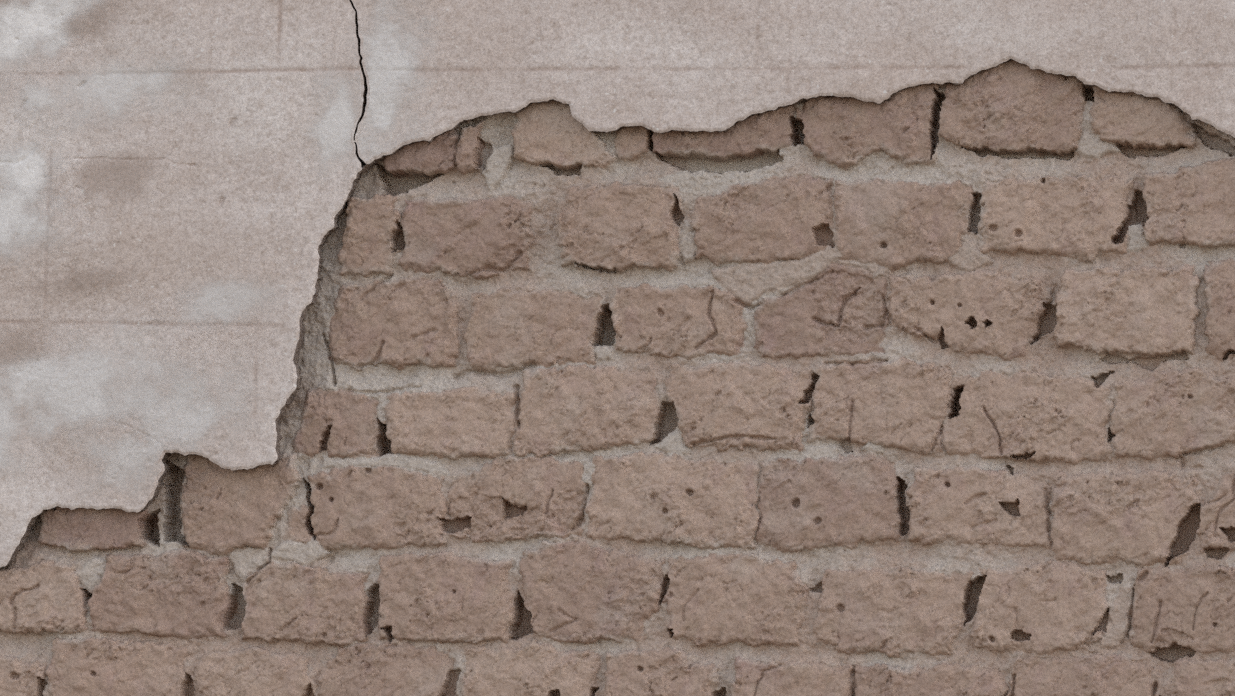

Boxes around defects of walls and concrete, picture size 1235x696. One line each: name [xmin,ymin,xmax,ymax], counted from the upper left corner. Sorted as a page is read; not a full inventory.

crack [349,0,370,170]
spalling [557,181,686,275]
spalling [655,149,784,175]
spalling [689,174,982,272]
spalling [978,174,1134,263]
spalling [1088,85,1235,159]
spalling [1111,157,1235,248]
spalling [753,262,1058,361]
spalling [1053,263,1201,375]
spalling [223,255,1235,696]
spalling [137,509,161,546]
spalling [0,601,337,696]